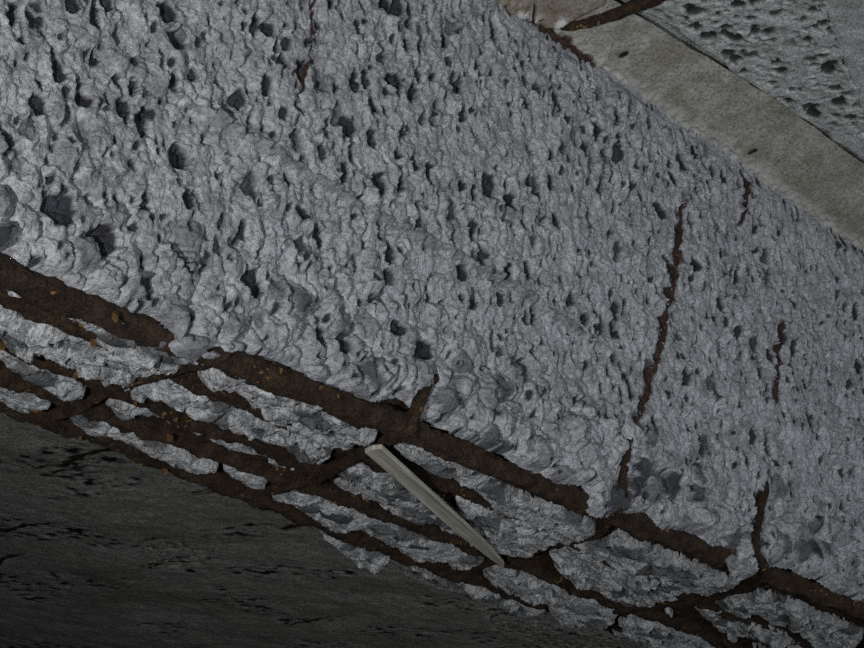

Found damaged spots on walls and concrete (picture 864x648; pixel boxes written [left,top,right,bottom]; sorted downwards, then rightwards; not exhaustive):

corrosion [291,0,316,137]
corrosion [516,11,595,68]
spalling [561,0,665,31]
corrosion [740,178,751,225]
corrosion [637,200,688,430]
corrosion [773,320,786,404]
corrosion [23,448,113,475]
spalling [0,253,864,648]